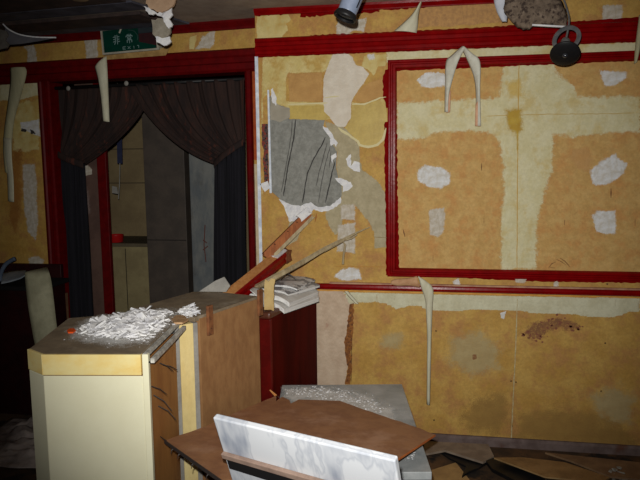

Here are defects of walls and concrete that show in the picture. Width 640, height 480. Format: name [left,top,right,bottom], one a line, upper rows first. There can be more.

spalling [260,54,386,248]
water stain [502,77,526,150]
peeling [316,291,350,385]